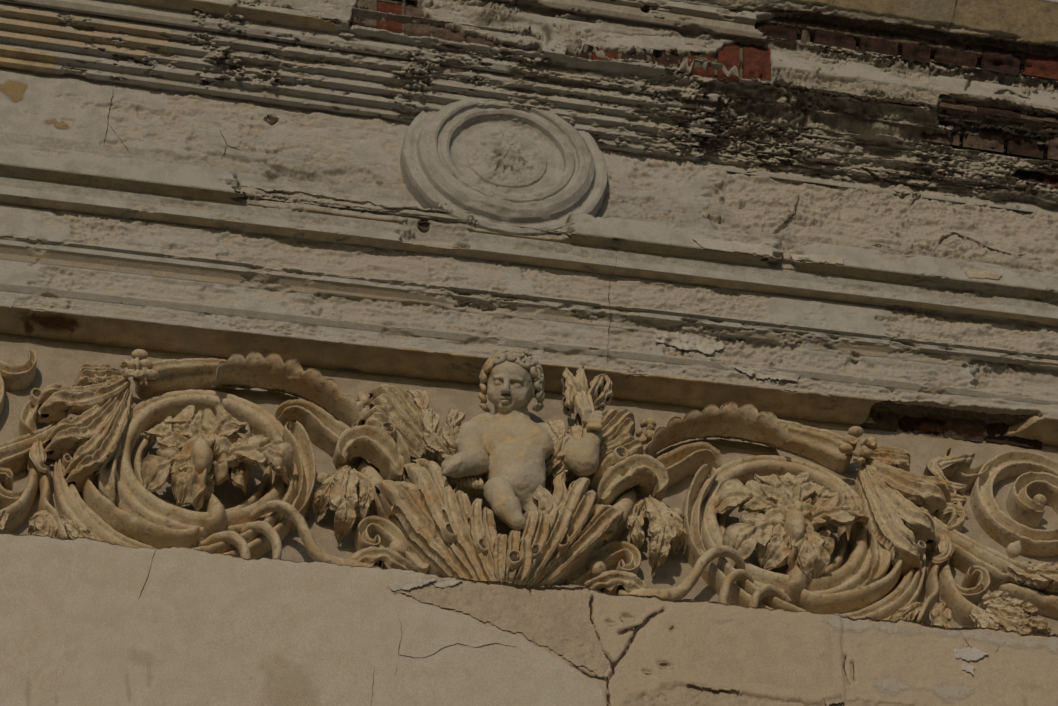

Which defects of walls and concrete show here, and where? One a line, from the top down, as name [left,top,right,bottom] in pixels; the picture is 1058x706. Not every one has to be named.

flaking render [350,0,543,54]
flaking render [566,11,1058,86]
flaking render [922,95,1058,160]
flaking render [1006,169,1058,188]
flaking render [654,331,725,355]
flaking render [734,366,800,382]
flaking render [861,401,1042,449]
crack [371,619,515,702]
crack [572,596,663,706]